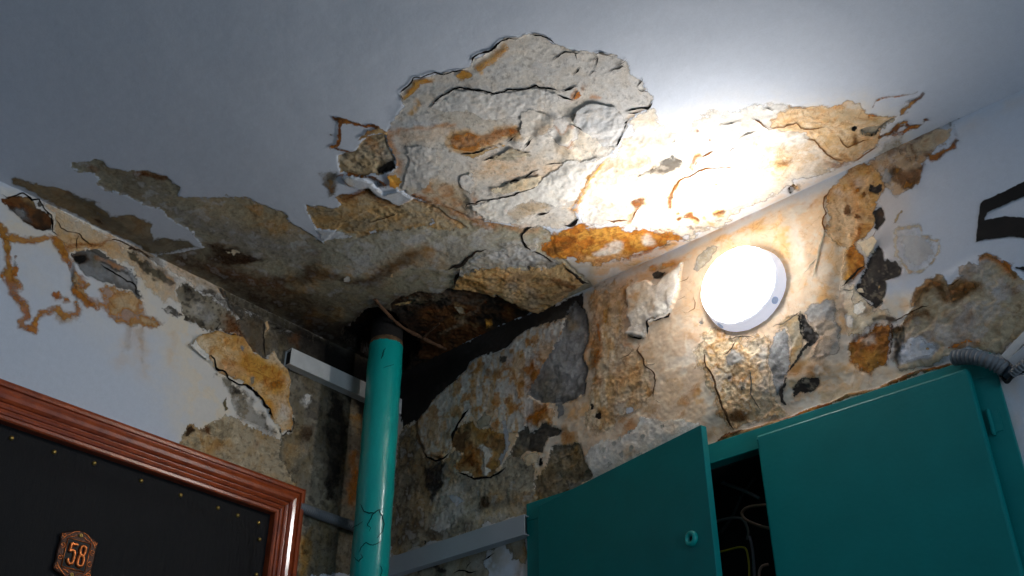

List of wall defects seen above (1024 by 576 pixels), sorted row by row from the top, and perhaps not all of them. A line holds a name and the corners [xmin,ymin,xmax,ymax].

spalling [1,195,54,231]
corrosion [72,272,160,328]
peeling [71,33,844,501]
crack [464,136,561,210]
crack [400,34,652,145]
corrosion [542,223,685,267]
crack [672,108,875,193]
spalling [694,184,902,430]
spalling [861,118,895,136]
corrosion [825,94,959,284]
damp [0,178,368,576]
crack [198,323,295,436]